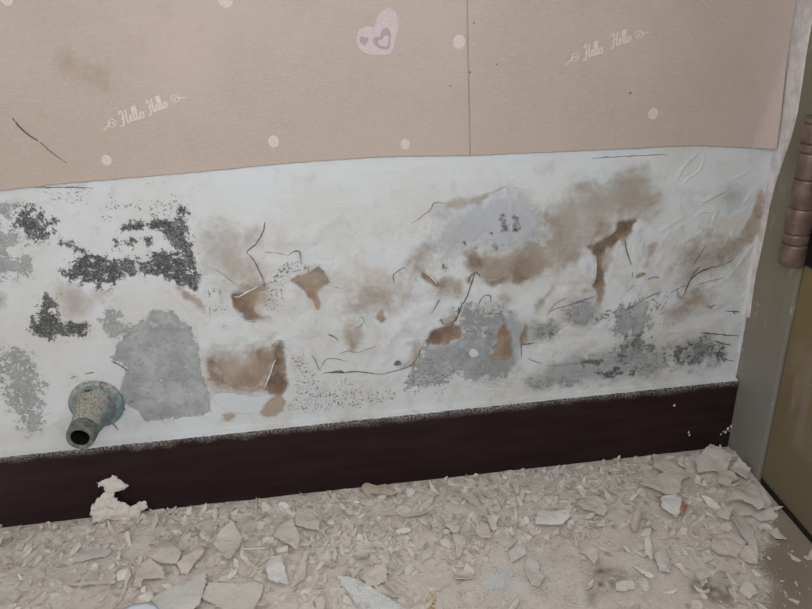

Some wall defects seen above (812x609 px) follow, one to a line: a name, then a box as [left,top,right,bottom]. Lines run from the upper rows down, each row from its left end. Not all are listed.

flaking render [0,188,328,322]
water stain [451,195,572,283]
water stain [209,351,274,388]
flaking render [26,265,520,421]
water stain [262,395,284,416]